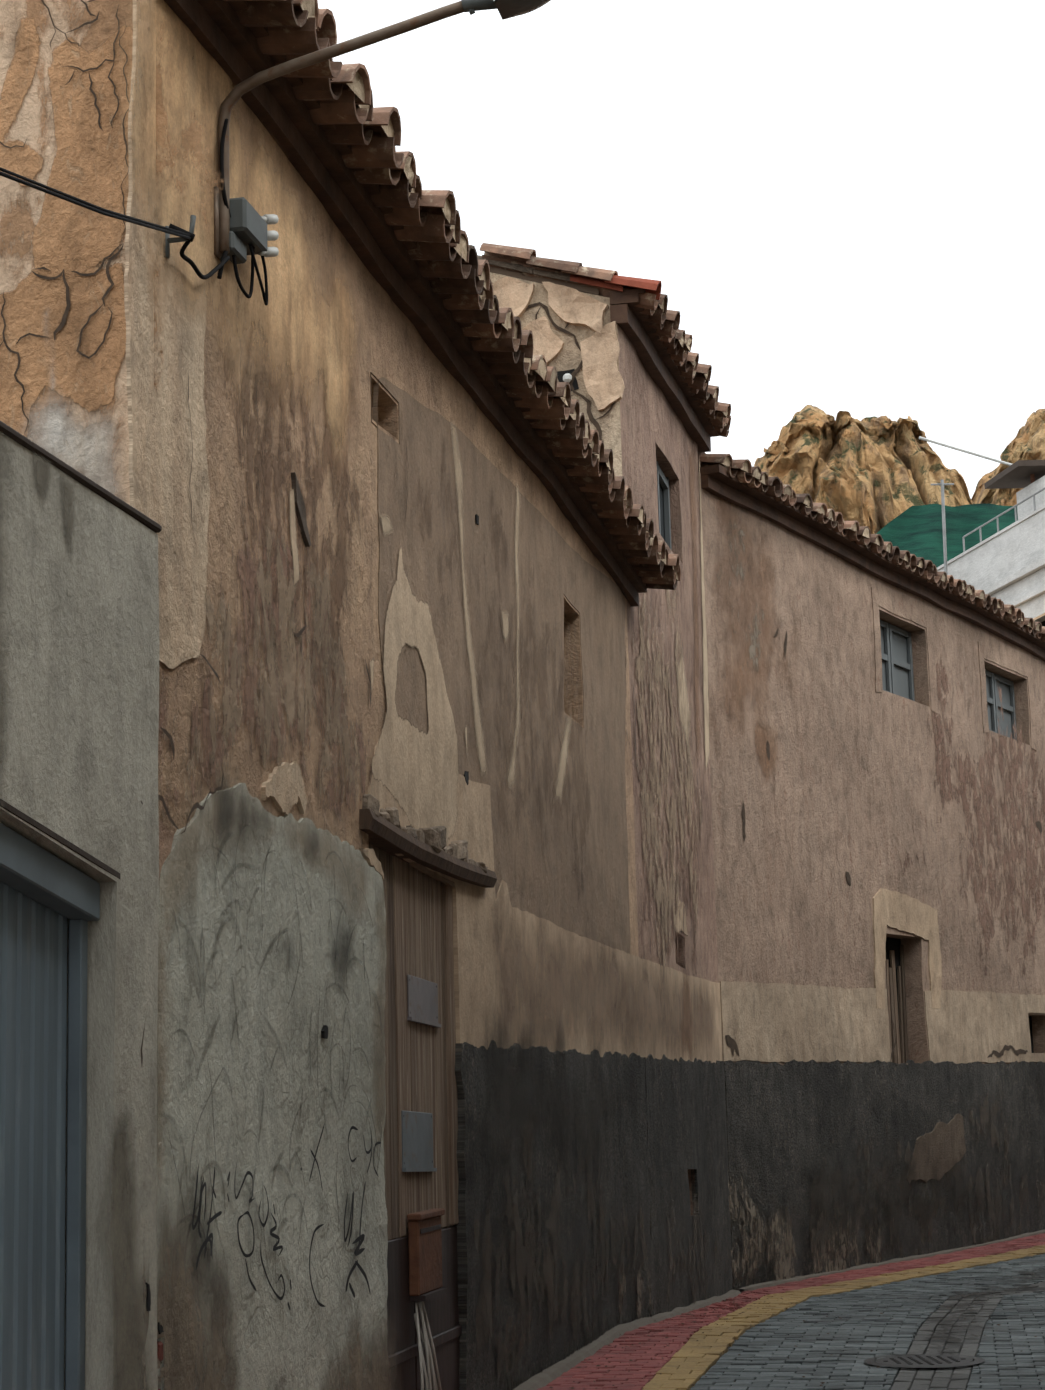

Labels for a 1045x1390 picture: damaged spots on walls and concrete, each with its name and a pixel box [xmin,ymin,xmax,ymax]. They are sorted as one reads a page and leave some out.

crack [0,0,130,435]
peeling [0,0,133,496]
peeling [156,62,217,227]
peeling [492,277,625,412]
leakage [34,406,113,552]
peeling [907,1114,966,1184]
leakage [105,1123,235,1390]
leakage [327,1327,395,1390]